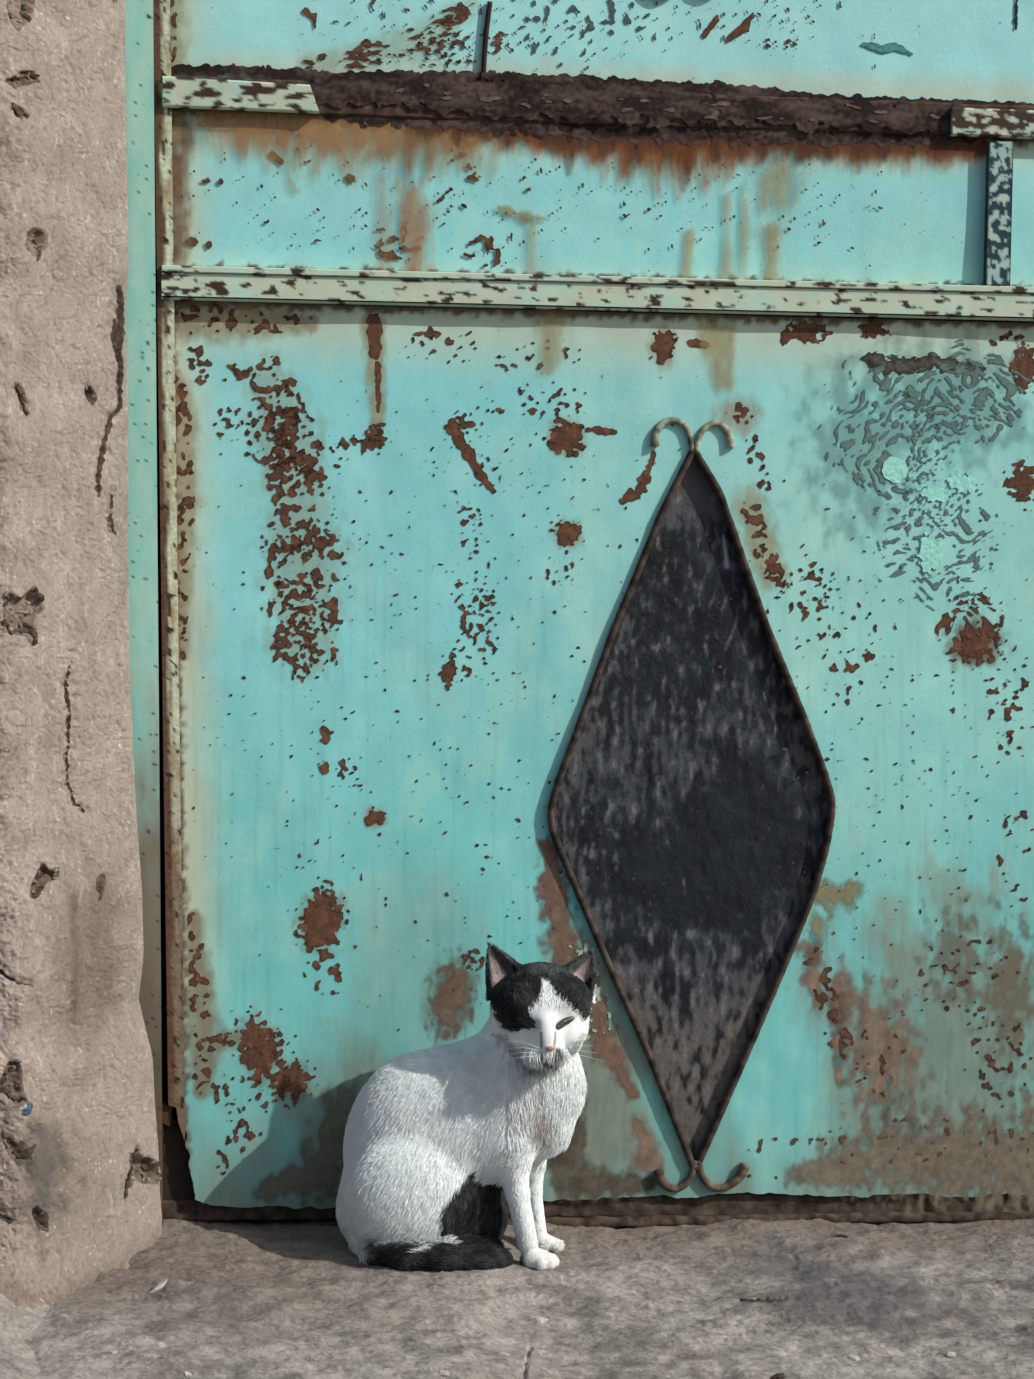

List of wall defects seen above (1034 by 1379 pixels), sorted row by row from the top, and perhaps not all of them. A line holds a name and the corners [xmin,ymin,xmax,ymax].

corrosion [170,0,1034,278]
corrosion [649,318,734,387]
corrosion [174,303,477,856]
corrosion [726,319,1034,907]
corrosion [188,912,319,1175]
corrosion [287,828,363,995]
corrosion [515,807,640,1098]